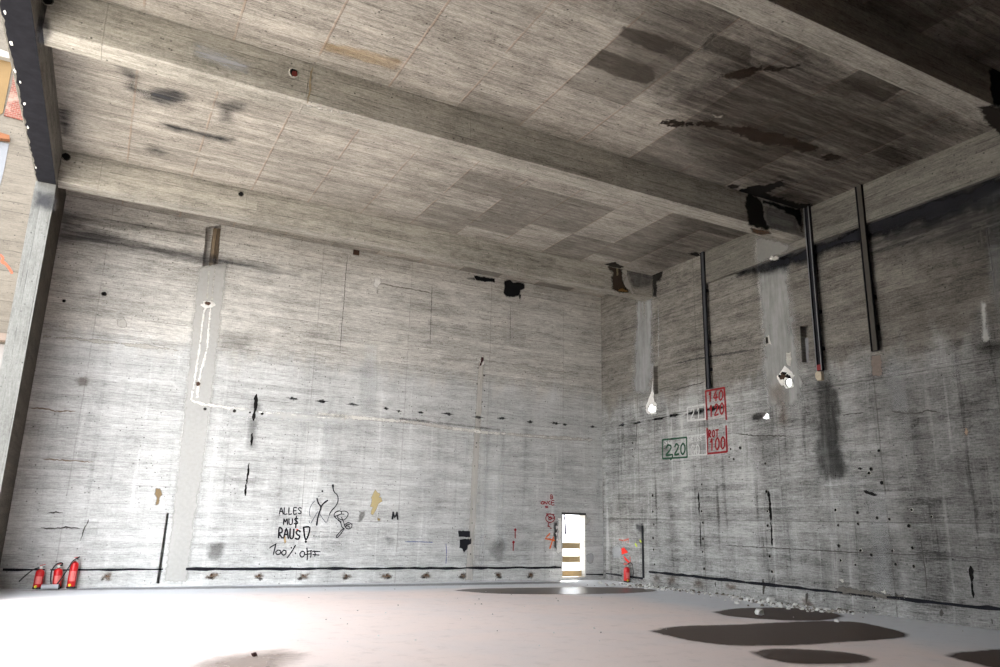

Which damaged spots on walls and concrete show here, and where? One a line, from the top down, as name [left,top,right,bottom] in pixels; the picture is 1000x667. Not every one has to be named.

leakage [817,381,845,477]